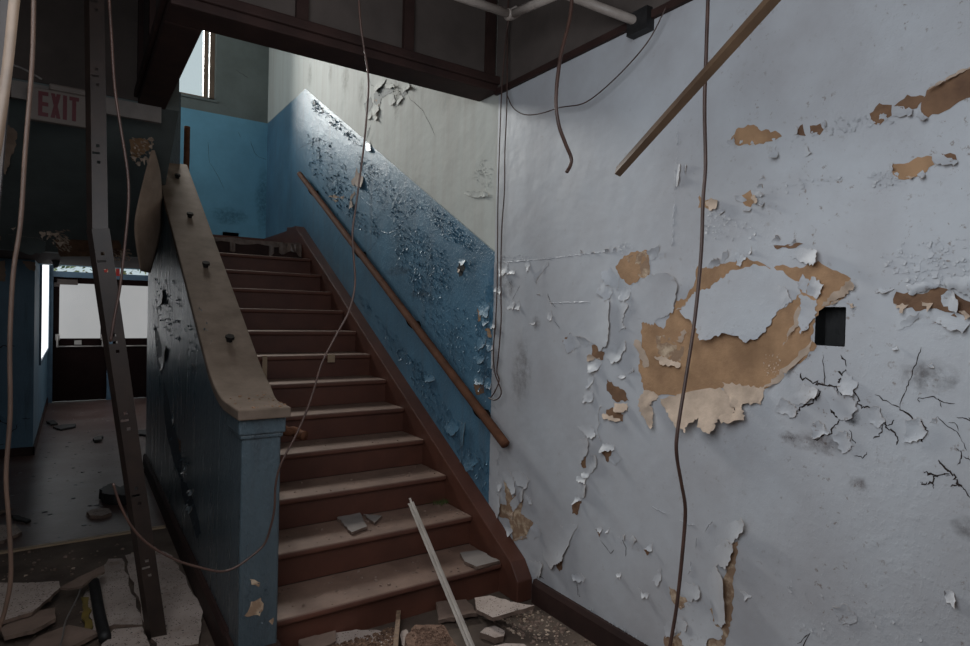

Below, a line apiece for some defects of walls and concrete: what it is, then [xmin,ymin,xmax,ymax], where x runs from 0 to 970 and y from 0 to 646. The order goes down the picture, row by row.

peeling [723,67,970,158]
peeling [865,153,958,188]
peeling [299,79,530,409]
peeling [875,237,970,333]
peeling [358,174,856,597]
crack [775,349,970,497]
peeling [638,518,752,646]